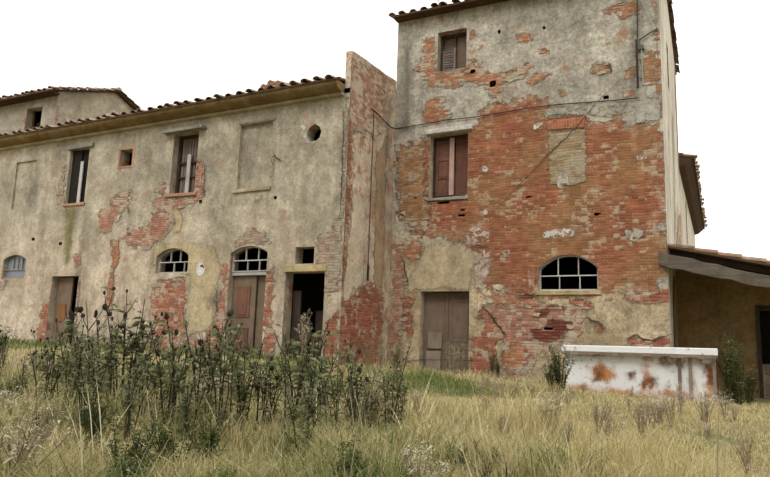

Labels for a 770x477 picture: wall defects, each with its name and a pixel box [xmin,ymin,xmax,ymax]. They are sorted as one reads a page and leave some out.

spalling [314,0,670,378]
spalling [97,159,206,312]
spalling [35,298,49,344]
spalling [73,262,229,352]
rust [561,352,717,399]